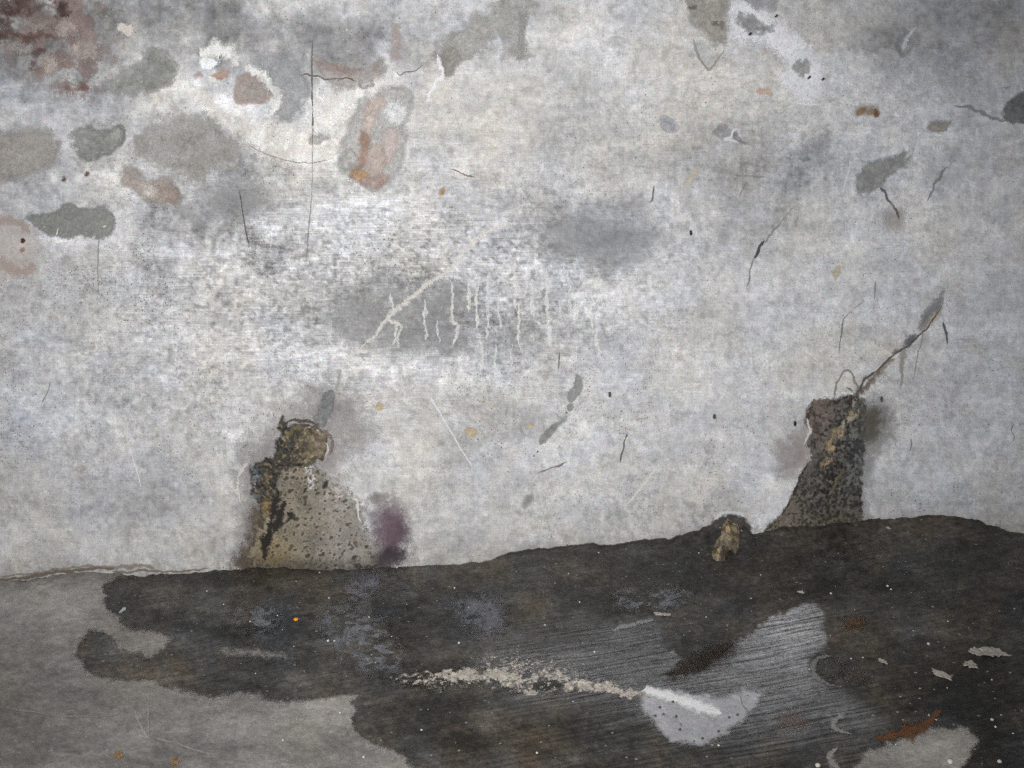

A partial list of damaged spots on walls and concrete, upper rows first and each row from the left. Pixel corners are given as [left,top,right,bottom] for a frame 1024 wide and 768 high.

damp [422,280,460,344]
damp [467,254,609,379]
crack [834,280,951,400]
damp [75,394,1024,768]